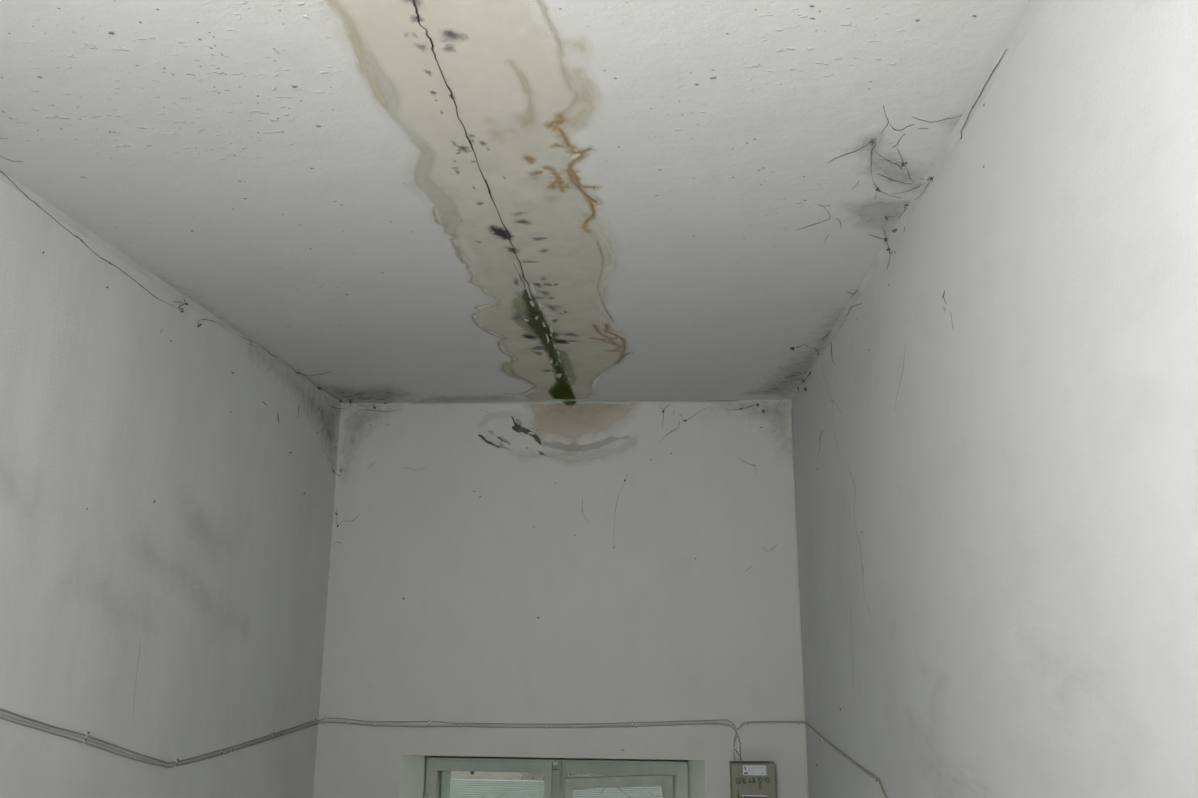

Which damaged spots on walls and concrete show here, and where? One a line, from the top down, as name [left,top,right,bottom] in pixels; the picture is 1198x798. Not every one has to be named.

crack [0,171,160,300]
damp [332,0,628,460]
crack [413,0,570,383]
rust [525,114,598,232]
peeling [478,416,548,457]